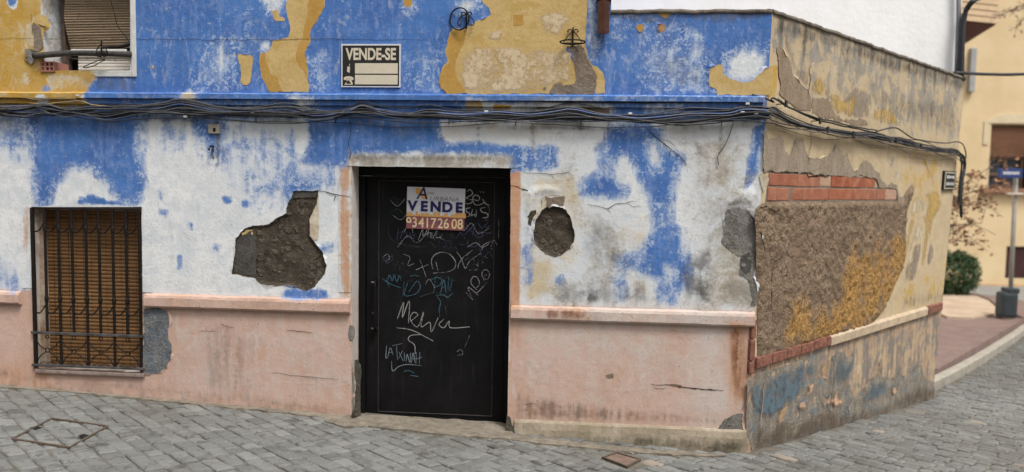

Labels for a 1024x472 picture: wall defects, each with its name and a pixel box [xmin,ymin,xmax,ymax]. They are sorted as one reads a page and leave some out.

flaking render [24,13,50,72]
peeling [238,0,325,93]
peeling [439,0,610,115]
peeling [706,33,812,111]
flaking render [763,131,903,203]
flaking render [230,189,327,291]
flaking render [527,196,575,258]
peeling [722,208,763,306]
peeling [143,308,174,376]
flaking render [716,336,937,451]